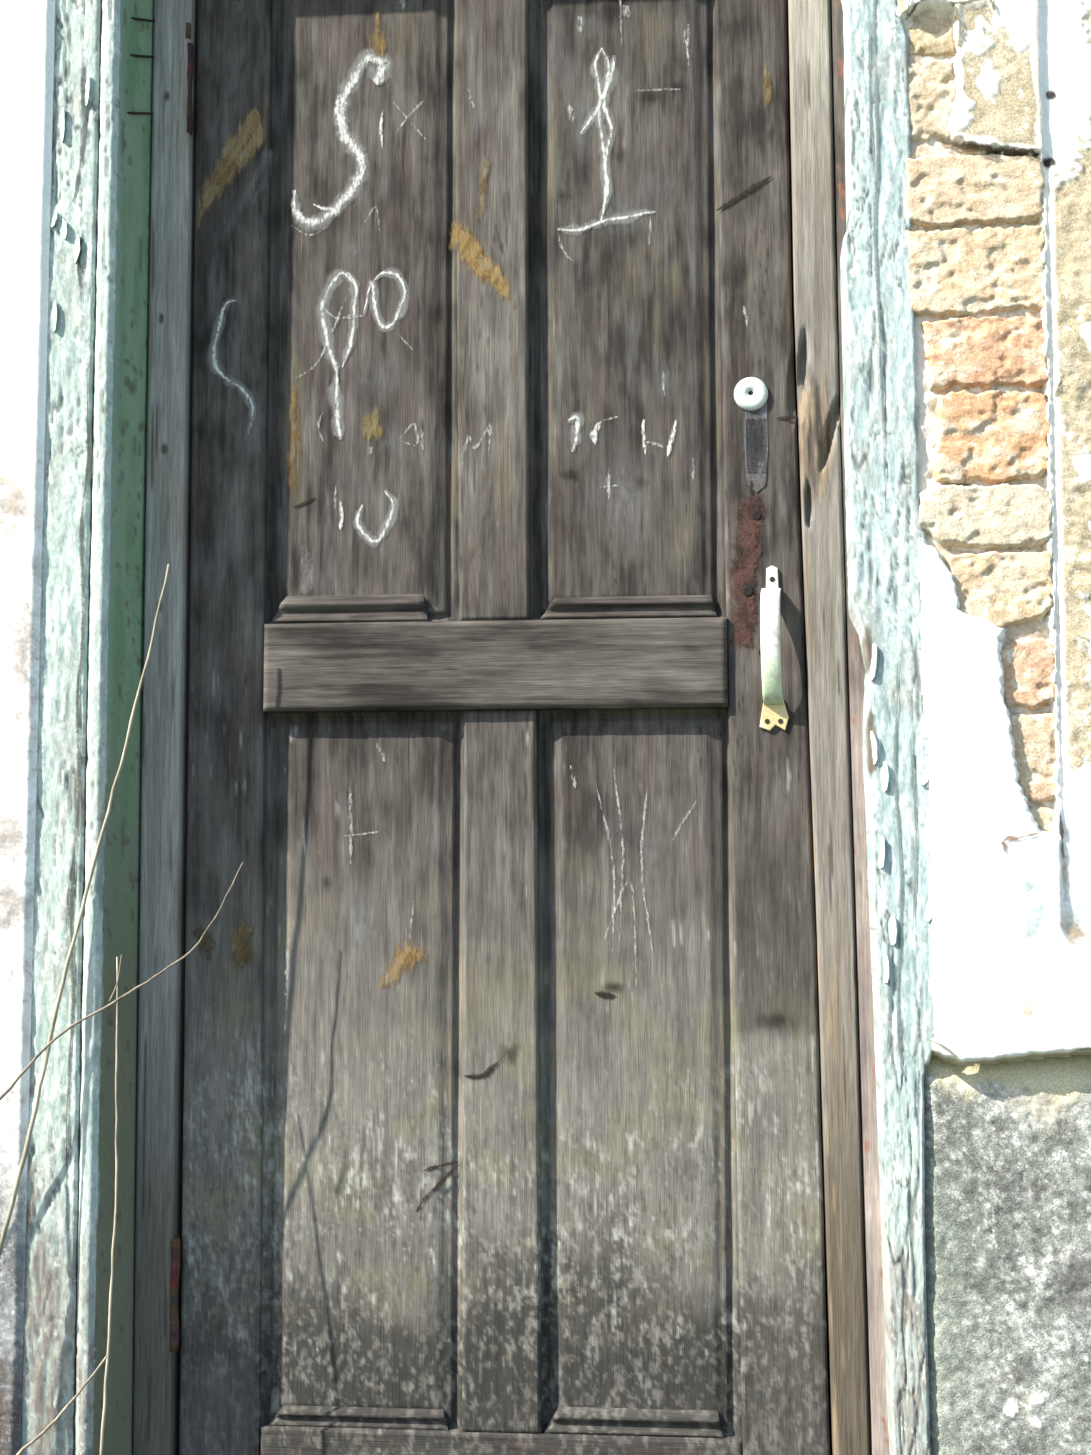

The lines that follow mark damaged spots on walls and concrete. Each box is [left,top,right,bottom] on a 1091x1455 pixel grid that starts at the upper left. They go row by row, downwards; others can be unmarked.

corrosion [729,494,767,648]
spalling [897,0,1091,833]